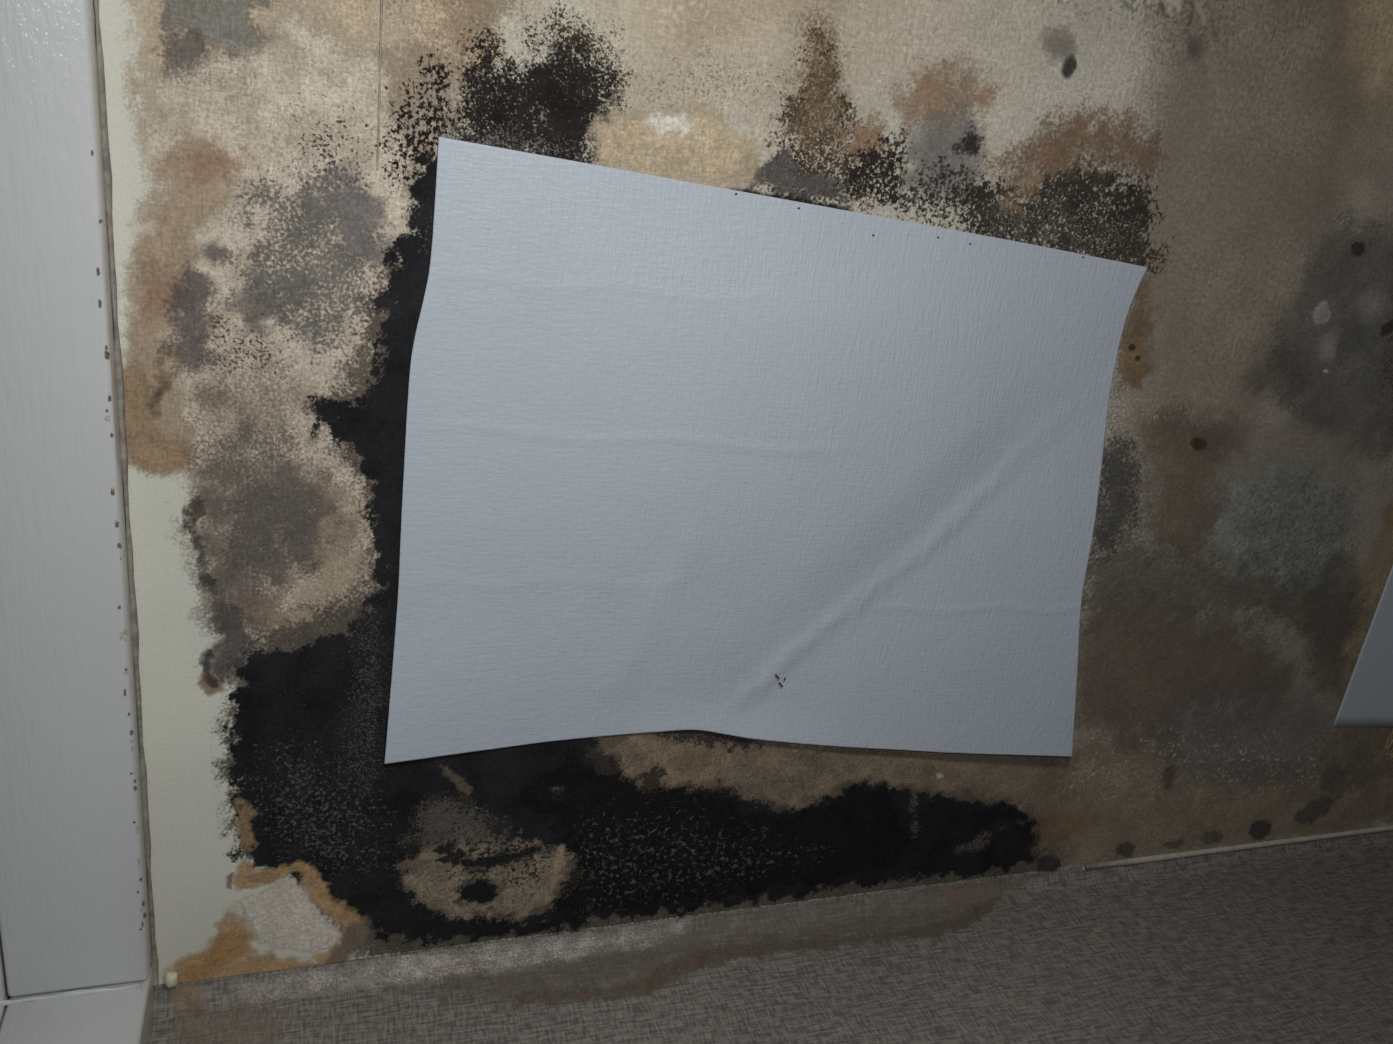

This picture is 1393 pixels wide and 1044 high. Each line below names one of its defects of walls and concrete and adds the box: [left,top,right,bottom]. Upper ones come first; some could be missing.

damp [433,880,1008,1006]